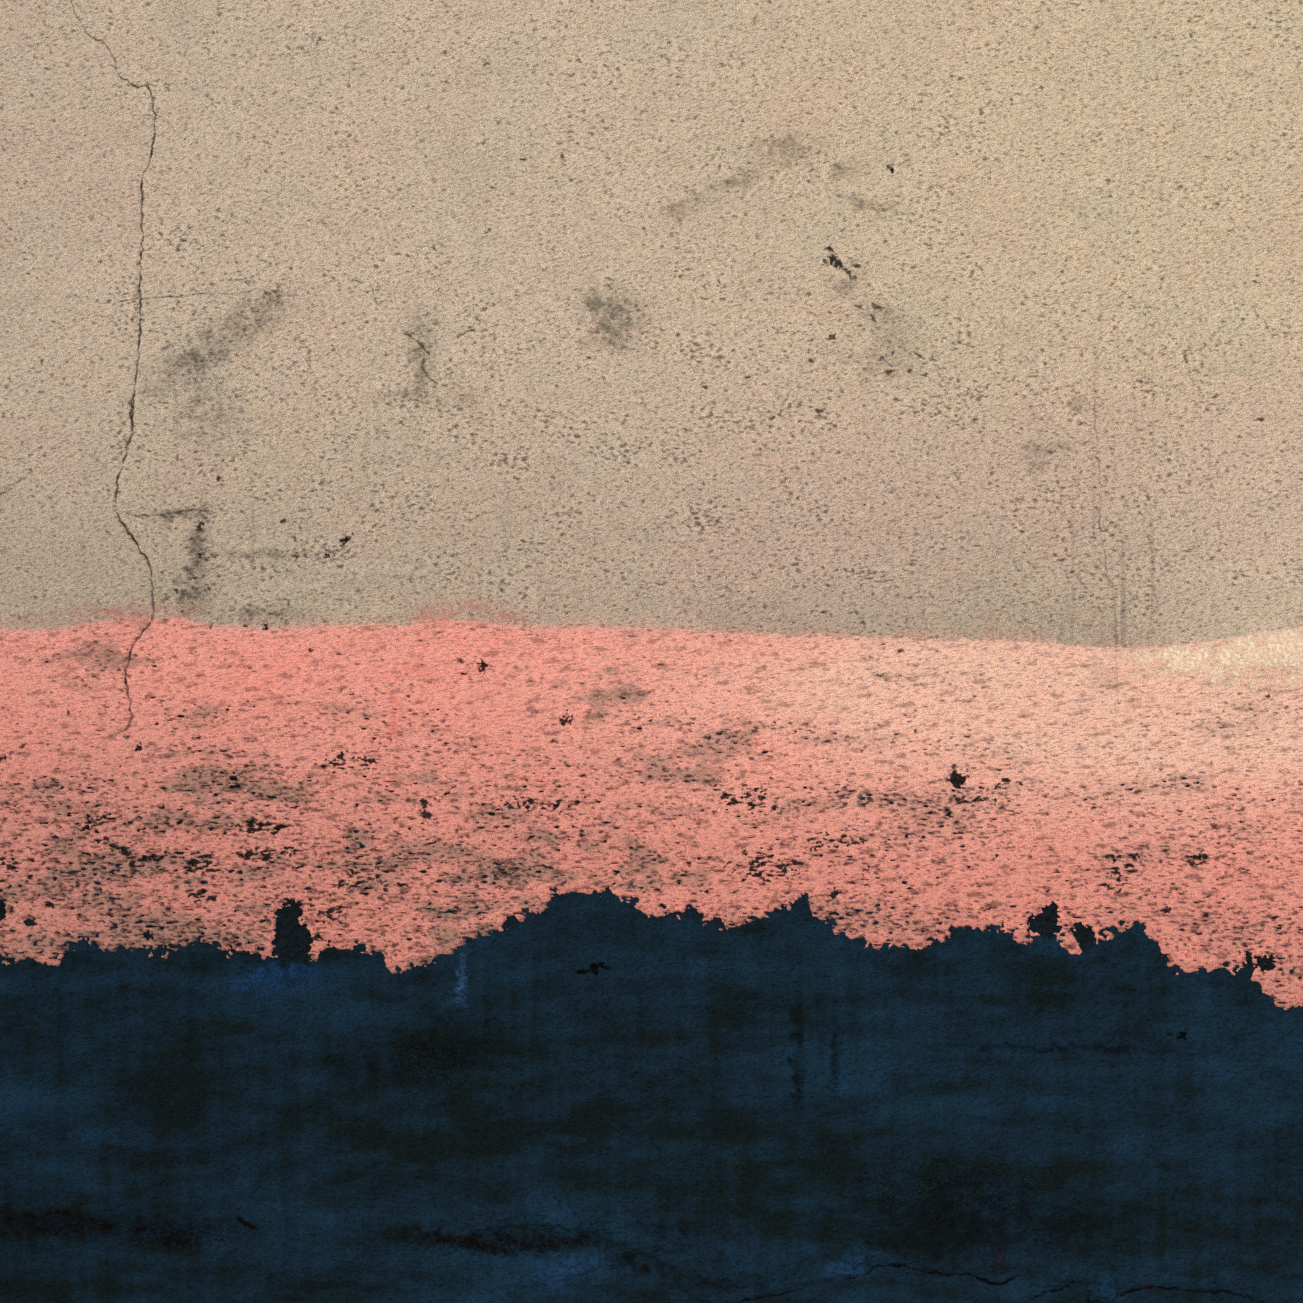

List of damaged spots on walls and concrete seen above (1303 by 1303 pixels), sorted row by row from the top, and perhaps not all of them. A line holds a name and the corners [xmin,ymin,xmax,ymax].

crack [115,77,182,730]